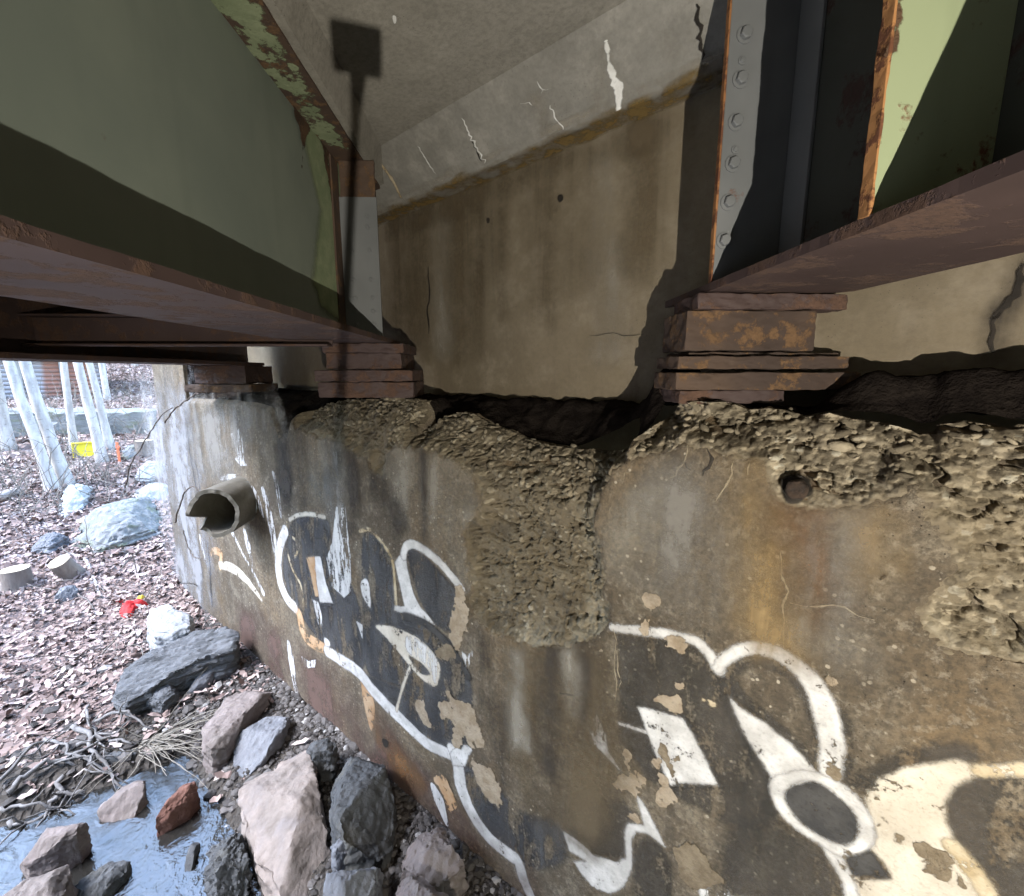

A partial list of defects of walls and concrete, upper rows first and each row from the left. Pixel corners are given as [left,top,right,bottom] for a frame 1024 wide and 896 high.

damp [604,40,623,111]
crack [694,4,705,59]
corrosion [884,0,903,57]
crack [462,119,486,161]
crack [988,263,1024,353]
damp [143,391,282,608]
spalling [291,398,1024,663]
peeling [415,690,502,812]